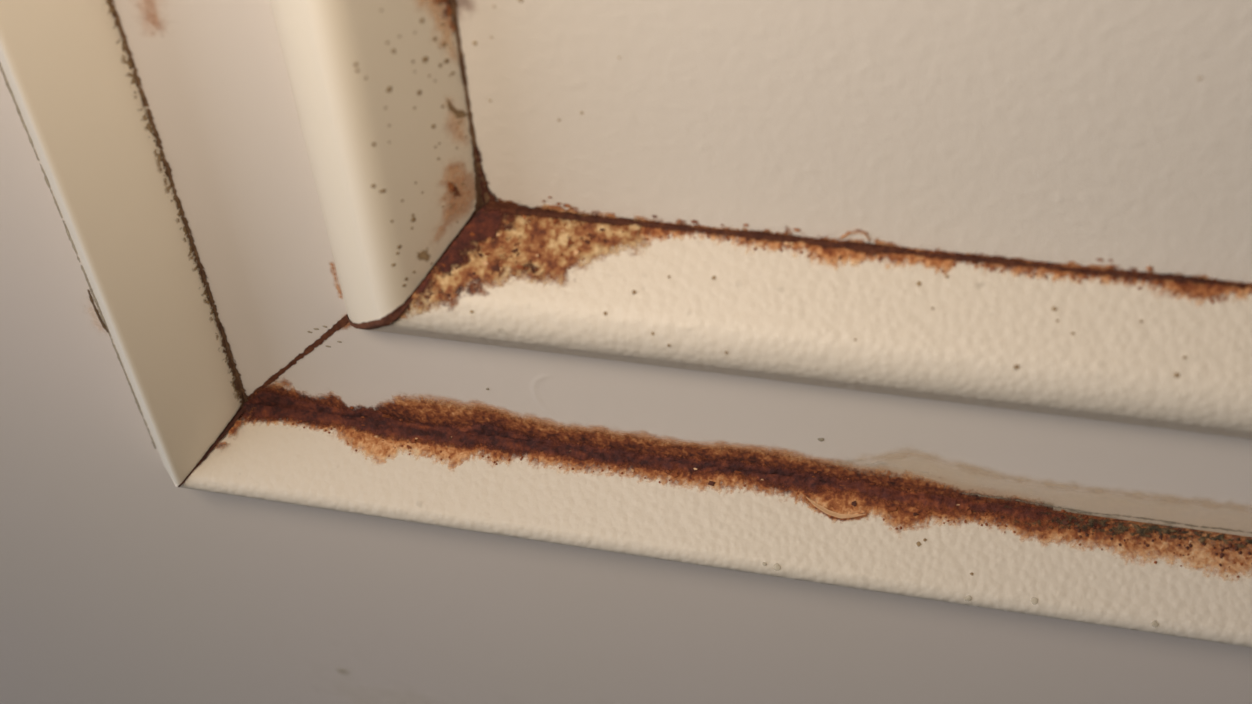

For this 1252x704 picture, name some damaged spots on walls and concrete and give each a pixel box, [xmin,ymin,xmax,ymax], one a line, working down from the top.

rust [441,101,467,149]
rust [397,143,1252,319]
rust [239,384,1252,578]